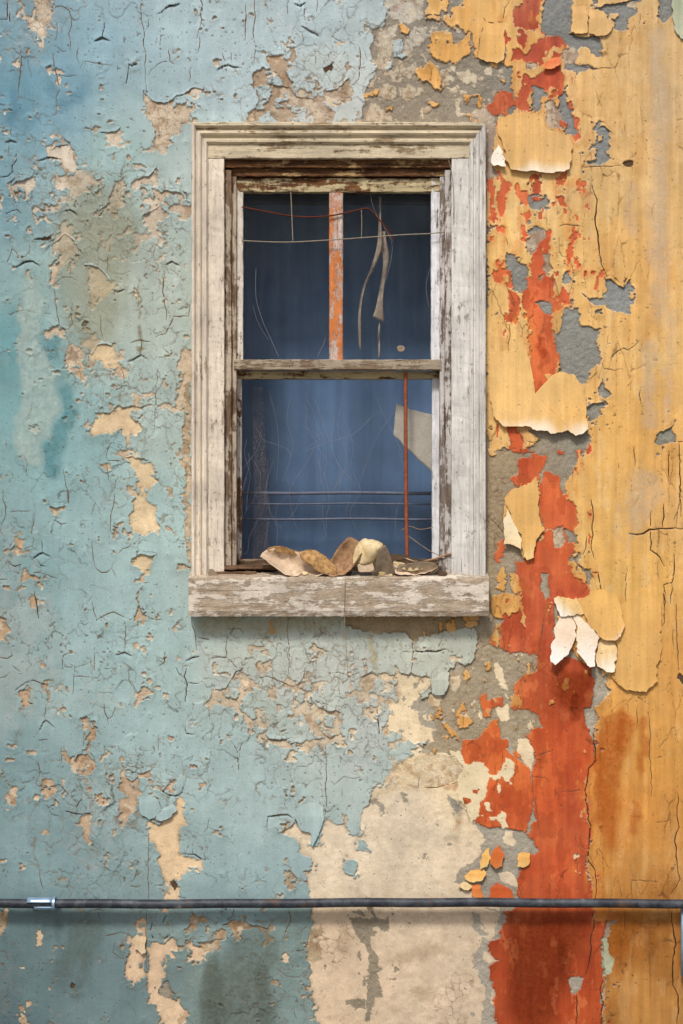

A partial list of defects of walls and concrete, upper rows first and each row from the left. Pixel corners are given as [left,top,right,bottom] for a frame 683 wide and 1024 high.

crack [18,6,105,110]
crack [140,0,203,94]
peeling [658,0,683,39]
peeling [48,84,204,225]
crack [156,271,190,337]
peeling [92,401,158,436]
crack [0,469,69,619]
peeling [126,453,162,622]
peeling [246,0,662,1024]
crack [629,441,683,669]
crack [159,618,244,699]
peeling [118,763,203,899]